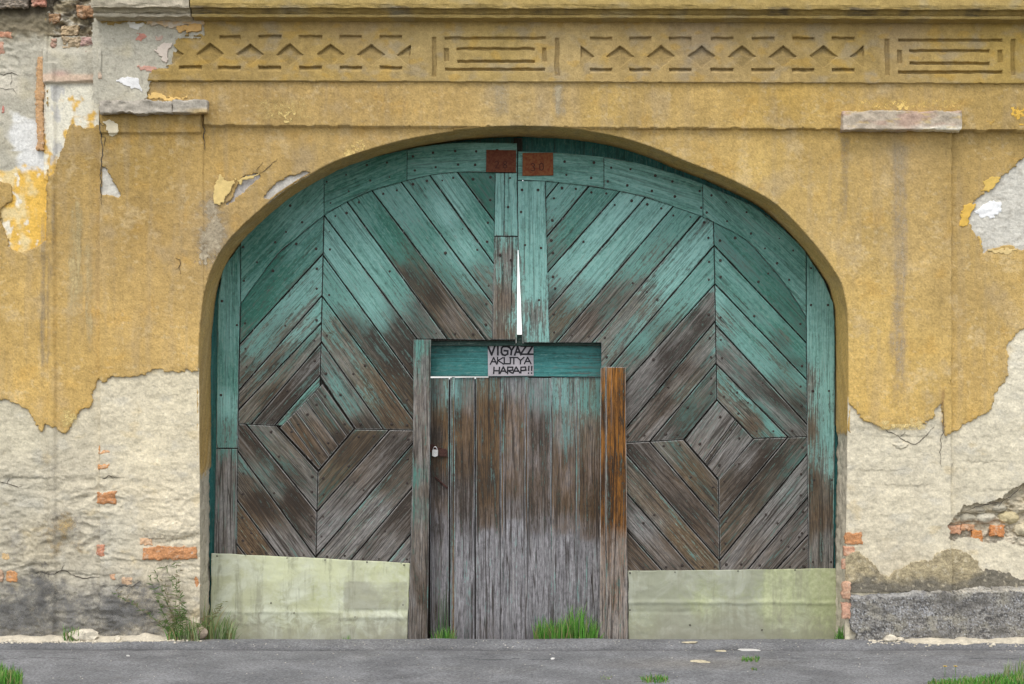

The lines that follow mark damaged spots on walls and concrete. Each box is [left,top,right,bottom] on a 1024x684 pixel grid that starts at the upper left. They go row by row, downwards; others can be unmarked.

peeling [0,0,205,252]
flaking render [213,173,260,205]
flaking render [264,171,310,203]
flaking render [959,158,1024,255]
crack [885,402,946,465]
flaking render [0,369,201,640]
flaking render [840,329,1024,639]
crack [35,567,91,579]
leakage [845,549,1024,593]